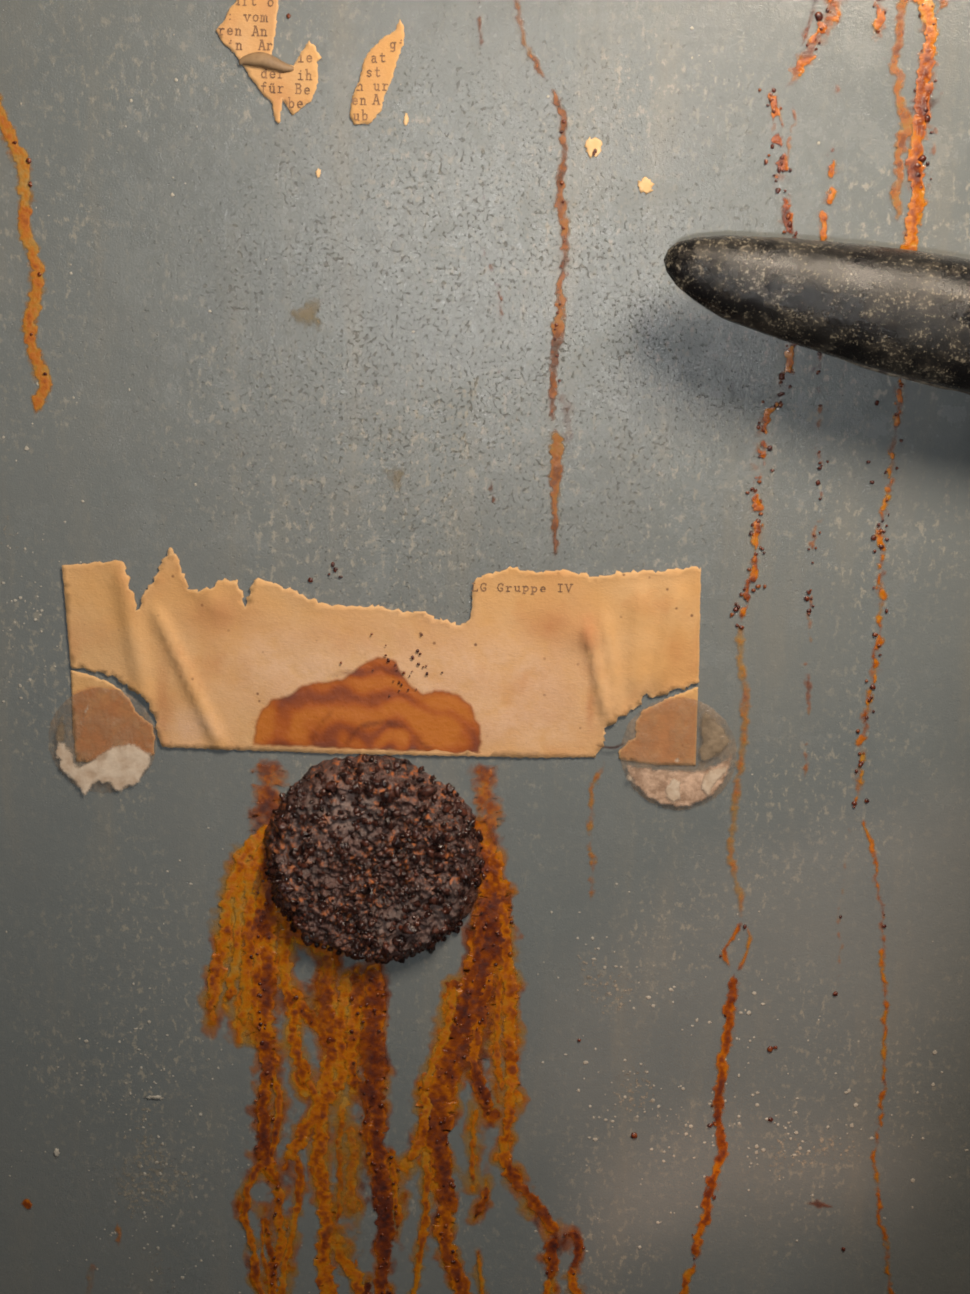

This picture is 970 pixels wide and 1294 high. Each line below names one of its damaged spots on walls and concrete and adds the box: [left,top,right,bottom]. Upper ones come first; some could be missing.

rust [0,96,53,411]
rust [549,90,569,553]
rust [758,88,798,238]
rust [789,0,841,76]
rust [819,149,837,241]
rust [873,0,947,251]
rust [728,344,796,870]
rust [852,379,904,808]
rust [200,633,586,1294]
rust [679,924,752,1294]
rust [863,822,879,898]
rust [871,914,894,1294]